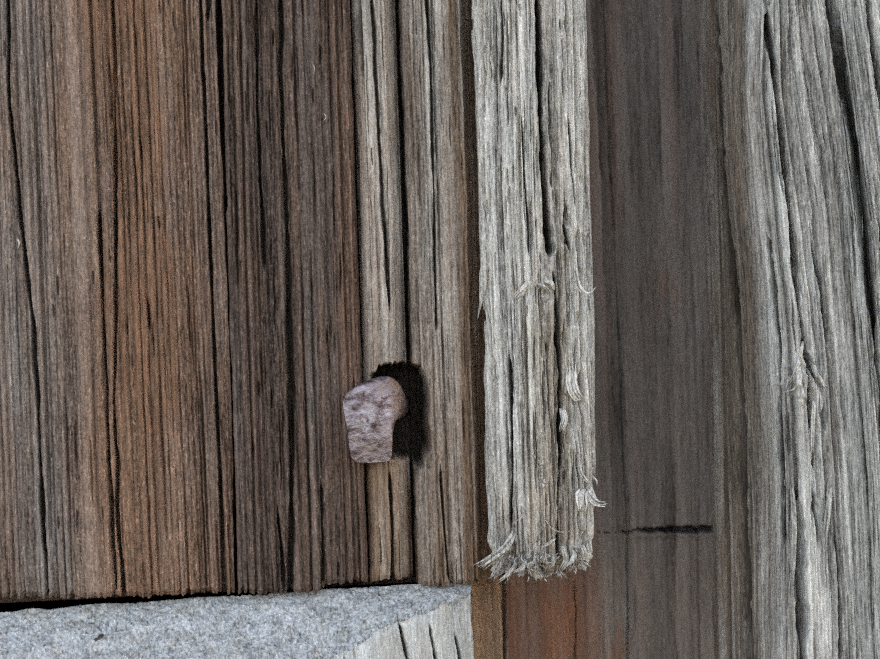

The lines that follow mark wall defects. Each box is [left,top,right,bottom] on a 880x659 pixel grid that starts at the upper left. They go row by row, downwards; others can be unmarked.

crack [637,525,713,533]